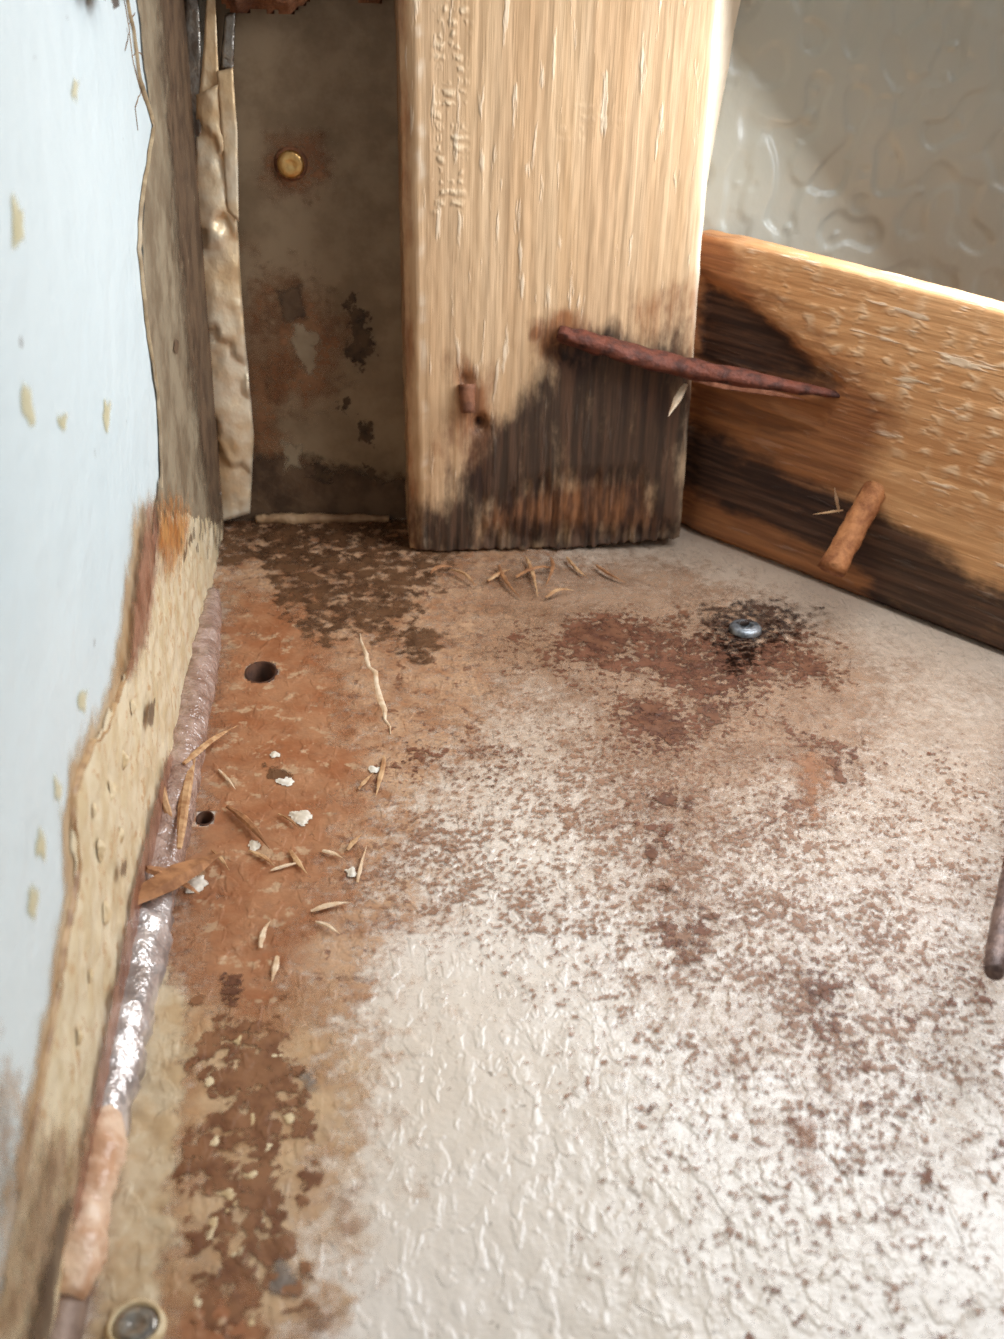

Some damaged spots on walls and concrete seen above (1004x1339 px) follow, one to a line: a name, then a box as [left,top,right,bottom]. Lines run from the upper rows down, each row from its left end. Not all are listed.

peeling [0,510,223,1339]
rust [117,499,189,677]
peeling [90,967,324,1339]
damp [126,0,590,1339]
rust [292,556,1004,1339]